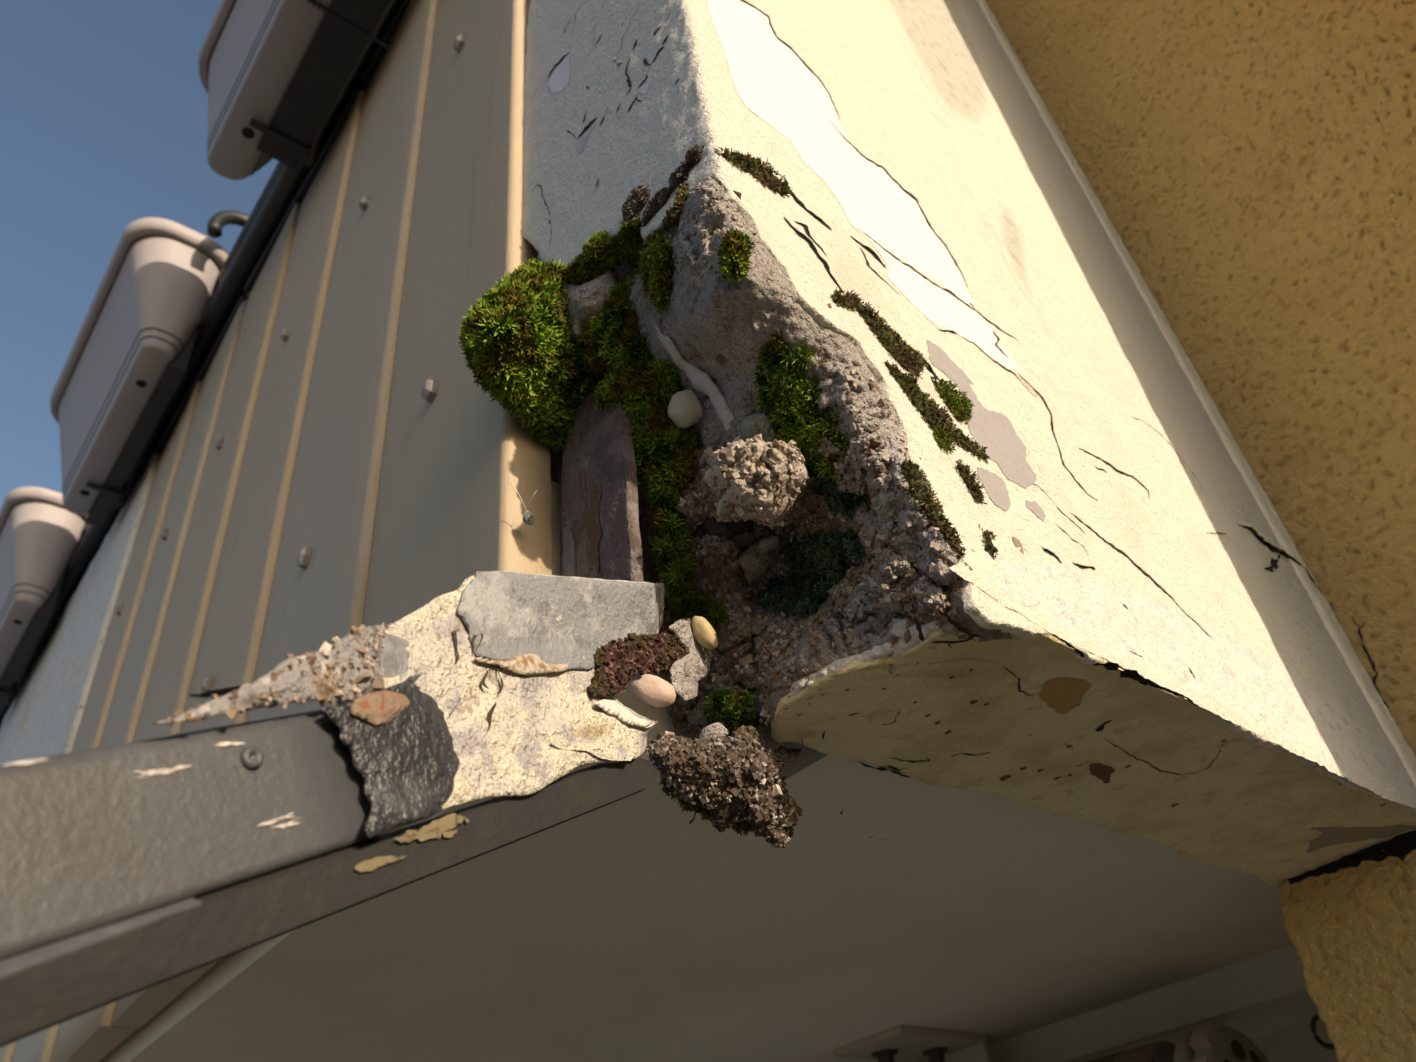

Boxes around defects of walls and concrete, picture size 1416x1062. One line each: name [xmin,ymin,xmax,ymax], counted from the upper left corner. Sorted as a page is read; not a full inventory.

crack [563,3,679,138]
peeling [707,0,1045,521]
water stain [993,196,1041,310]
crack [742,0,1212,644]
efflorescence [651,320,743,442]
spalling [606,176,1012,760]
peeling [188,685,242,698]
peeling [350,690,410,726]
water stain [831,660,1004,689]
crack [1004,667,1036,696]
crack [1351,616,1391,710]
peeling [355,813,469,872]